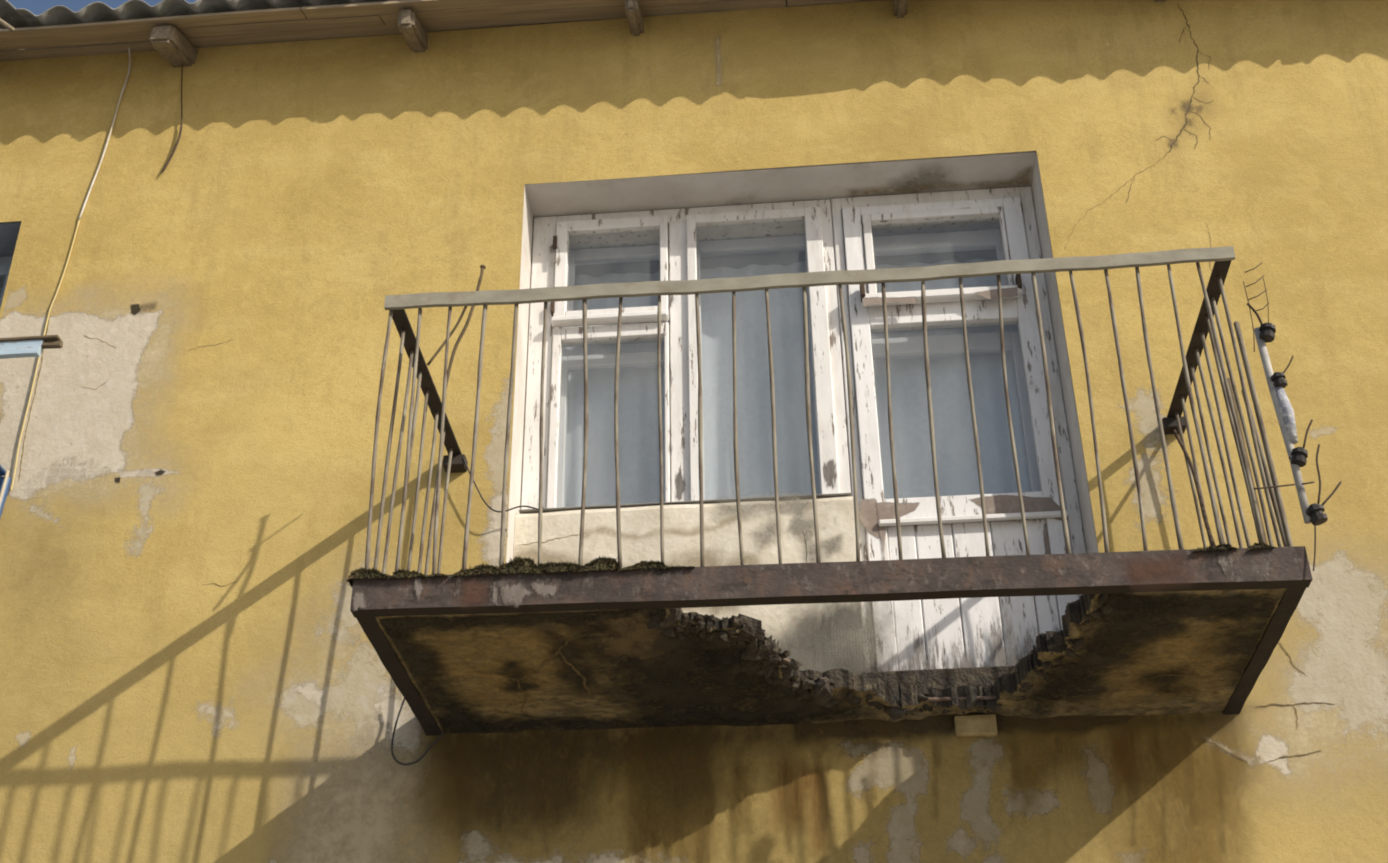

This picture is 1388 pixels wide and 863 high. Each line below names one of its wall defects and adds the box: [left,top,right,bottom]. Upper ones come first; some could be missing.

crack [1064,4,1213,249]
peeling [0,288,180,556]
damp [513,551,584,566]
damp [668,555,755,567]
damp [724,495,840,560]
peeling [823,460,836,488]
peeling [859,498,919,560]
peeling [970,495,1067,554]
peeling [278,579,424,772]
spalling [646,594,1112,720]
peeling [1253,551,1388,775]
peeling [841,740,929,863]